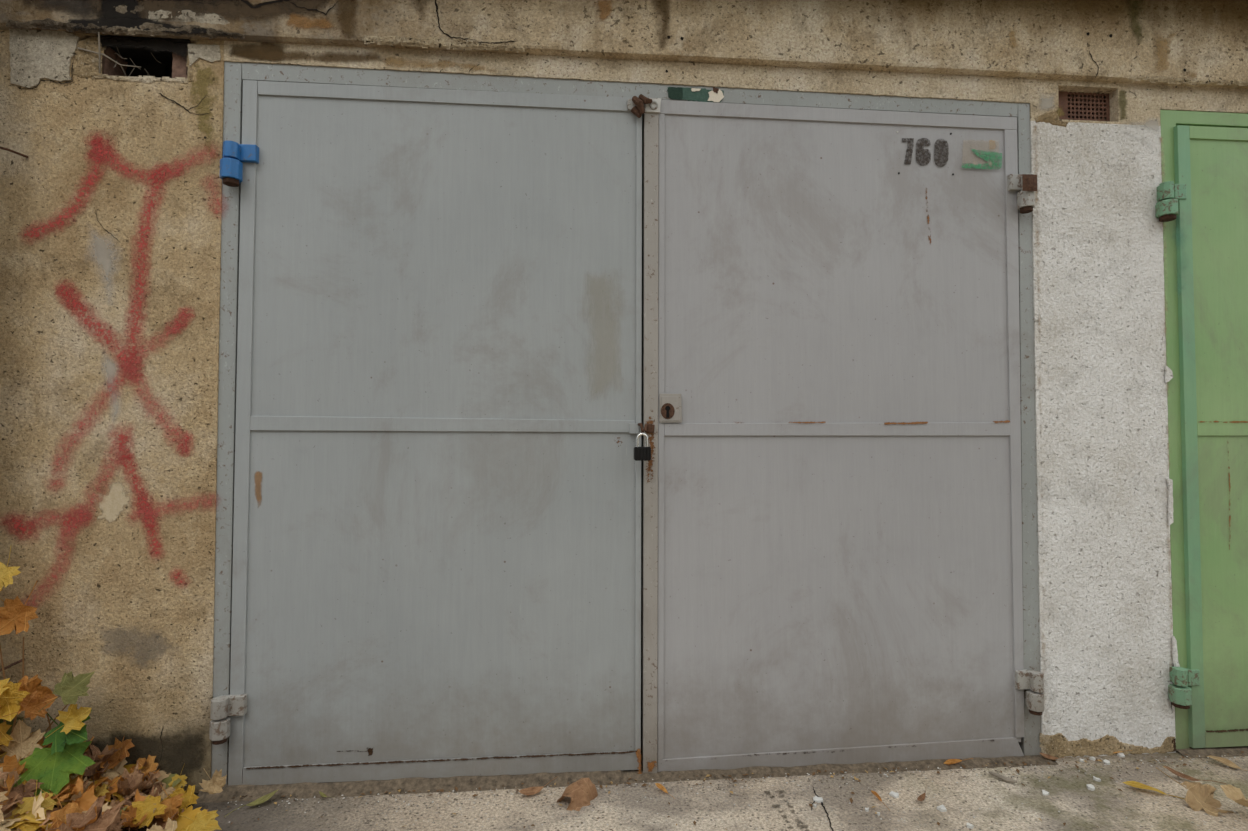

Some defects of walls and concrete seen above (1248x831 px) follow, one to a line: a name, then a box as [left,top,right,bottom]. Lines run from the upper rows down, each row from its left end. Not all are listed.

crack [148,0,336,15]
peeling [6,4,245,90]
peeling [1040,733,1176,758]
crack [811,787,834,831]